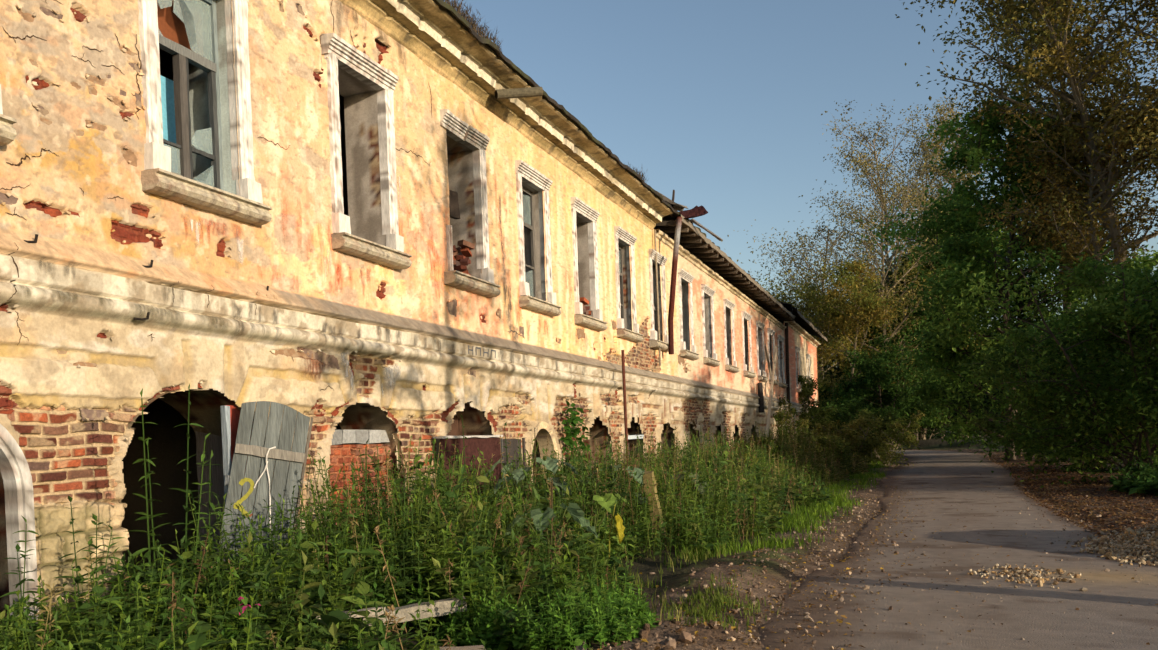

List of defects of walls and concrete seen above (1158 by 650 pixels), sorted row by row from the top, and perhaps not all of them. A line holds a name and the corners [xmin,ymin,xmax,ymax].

peeling [15,5,90,23]
spalling [25,59,146,125]
crack [0,148,56,346]
spalling [0,192,80,217]
spalling [111,203,167,249]
spalling [216,238,233,257]
spalling [376,281,386,300]
spalling [576,317,661,372]
spalling [0,381,180,505]
spalling [270,347,402,481]
spalling [487,394,533,448]
spalling [550,383,658,461]